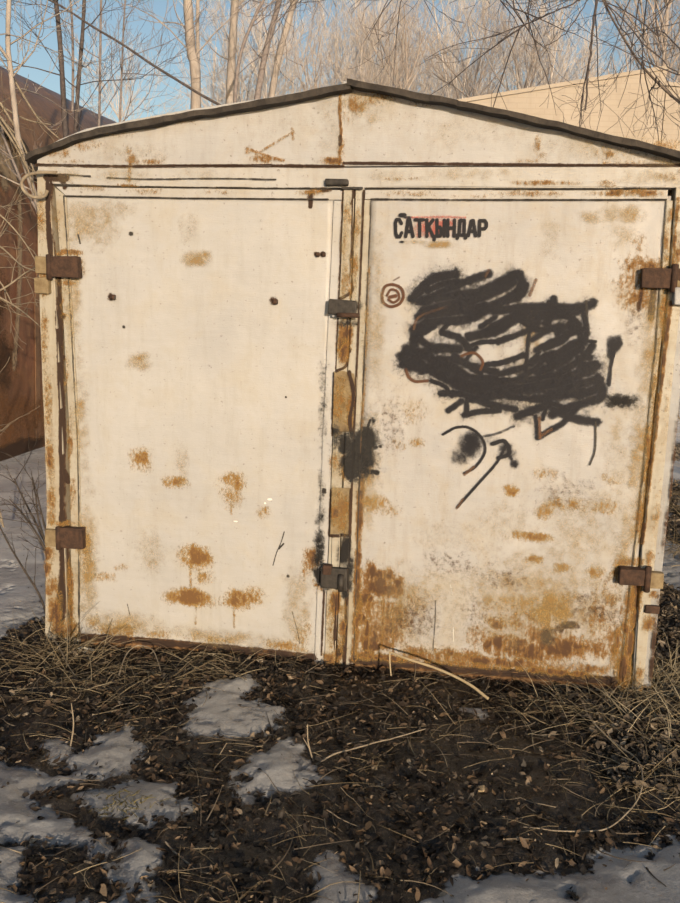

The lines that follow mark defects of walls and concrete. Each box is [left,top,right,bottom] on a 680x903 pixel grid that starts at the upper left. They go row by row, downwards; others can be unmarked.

corrosion [245,128,294,163]
corrosion [117,149,159,194]
corrosion [304,187,331,209]
corrosion [491,180,580,196]
corrosion [595,181,662,198]
corrosion [37,173,85,273]
corrosion [0,188,76,527]
corrosion [43,197,680,695]